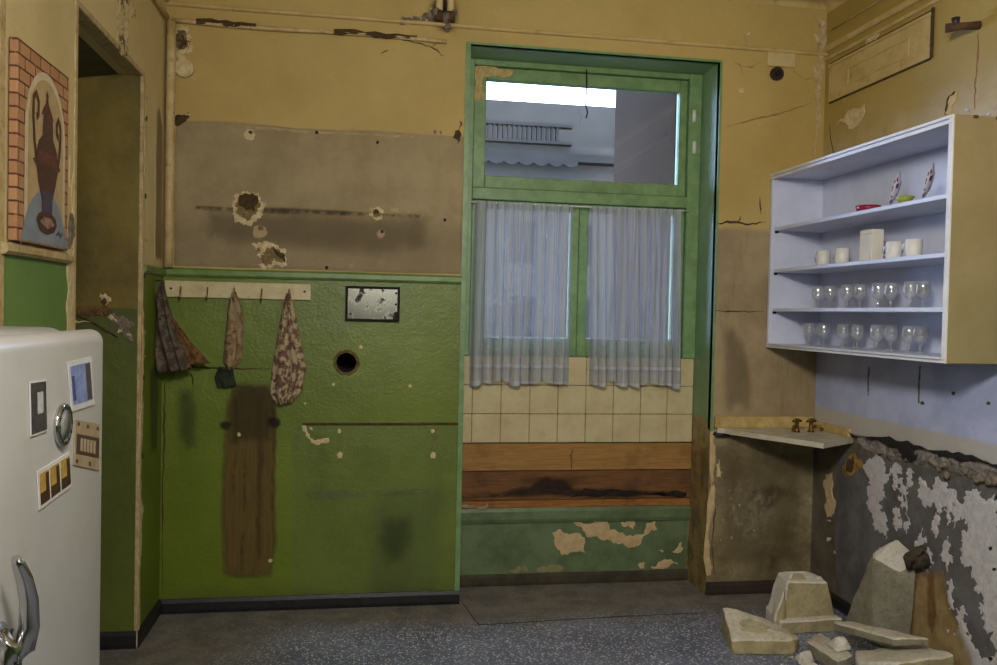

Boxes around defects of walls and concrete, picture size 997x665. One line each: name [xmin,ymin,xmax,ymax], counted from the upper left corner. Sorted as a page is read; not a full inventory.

crack [380,40,443,56]
flaking render [232,191,266,226]
flaking render [251,241,287,270]
flaking render [703,431,733,576]
peeling [510,521,657,574]
peeling [638,542,683,569]
peeling [721,432,997,665]